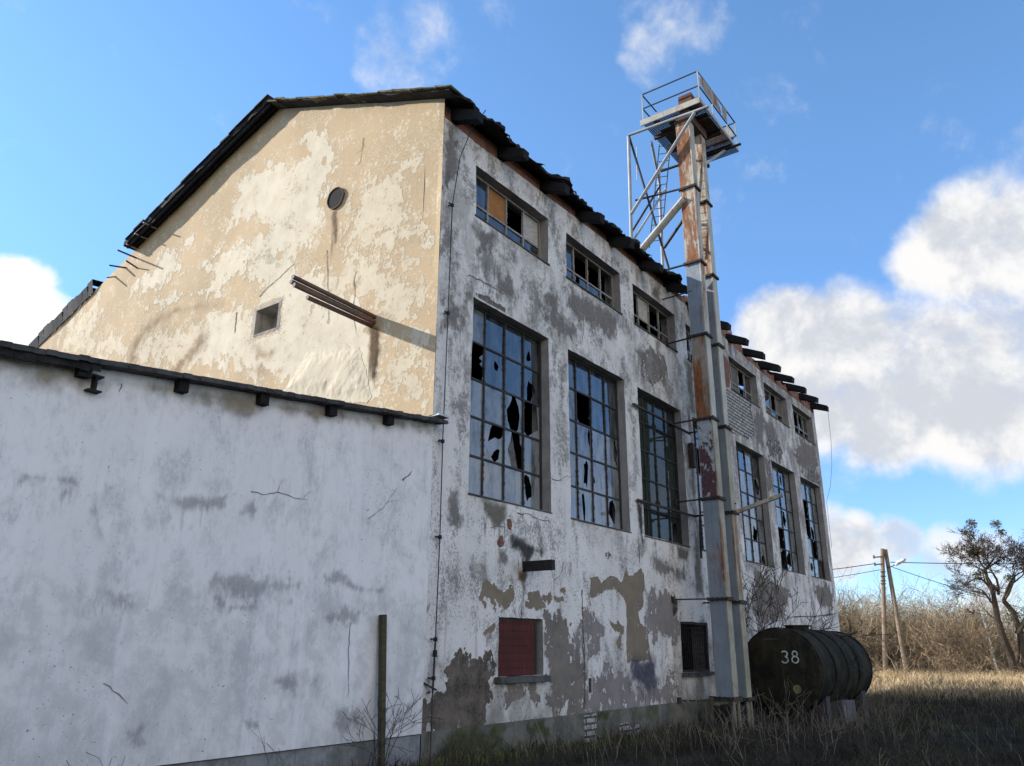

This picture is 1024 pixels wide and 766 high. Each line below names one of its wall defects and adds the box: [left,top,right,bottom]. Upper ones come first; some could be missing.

damp [445,124,459,188]
damp [477,225,496,253]
peeling [51,127,436,415]
damp [441,292,471,330]
damp [498,274,516,300]
damp [545,286,617,341]
flaking render [422,567,682,744]